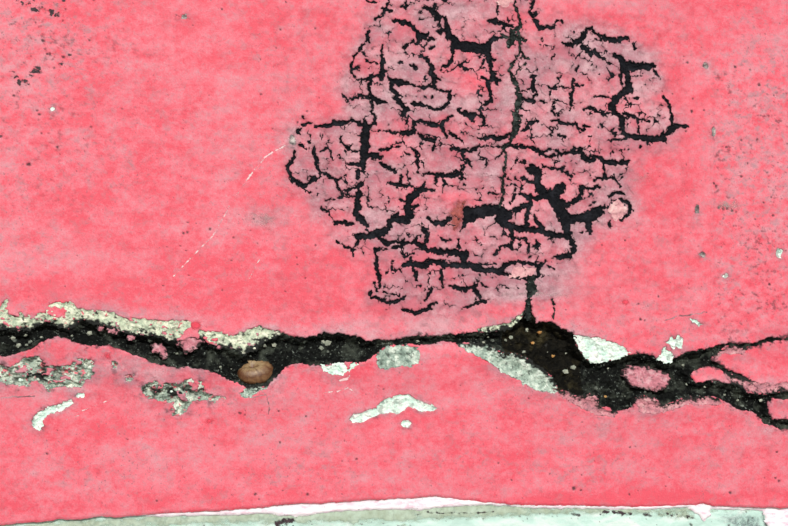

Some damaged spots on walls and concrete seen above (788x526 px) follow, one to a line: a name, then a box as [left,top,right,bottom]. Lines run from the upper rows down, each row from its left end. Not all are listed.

crack [374,0,393,27]
crack [526,0,564,30]
crack [0,18,788,430]
spalling [0,299,282,357]
spalling [376,345,420,370]
spalling [0,356,95,431]
spalling [141,379,226,416]
peeling [350,394,437,428]